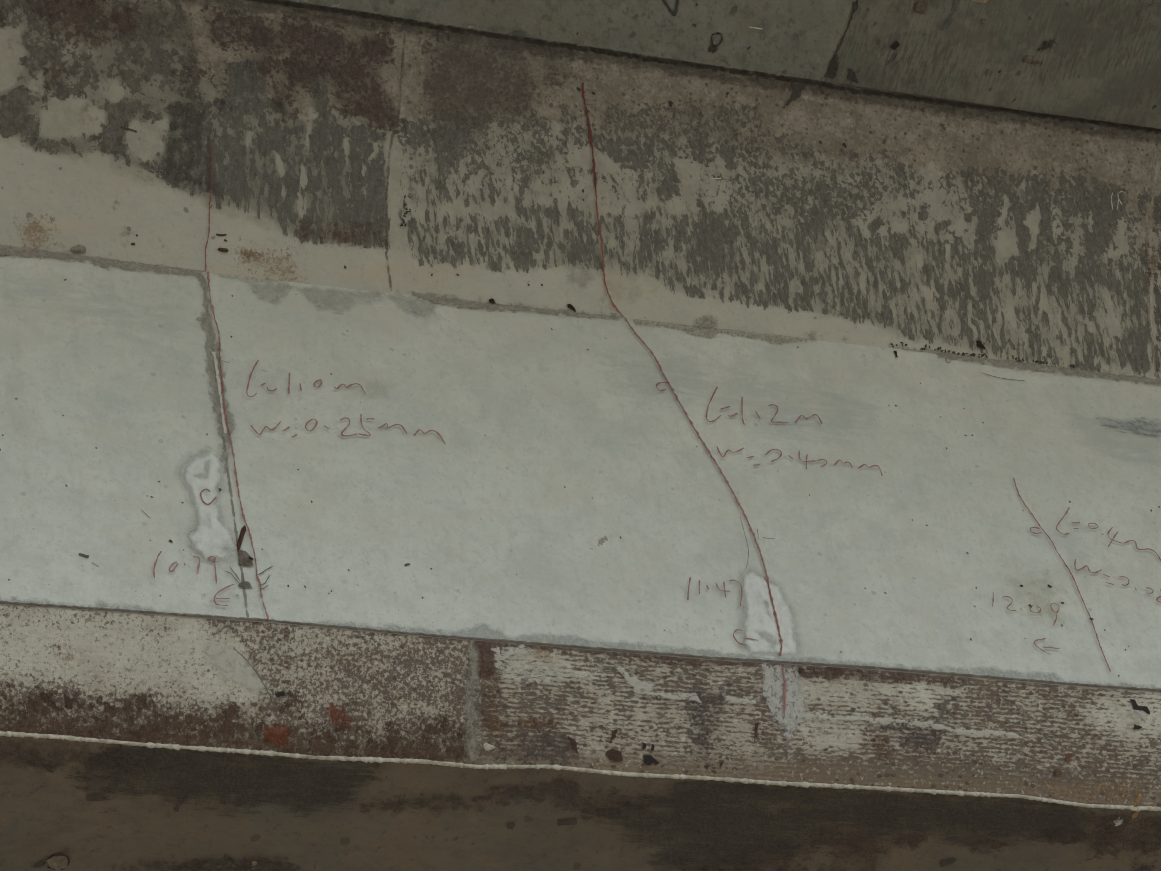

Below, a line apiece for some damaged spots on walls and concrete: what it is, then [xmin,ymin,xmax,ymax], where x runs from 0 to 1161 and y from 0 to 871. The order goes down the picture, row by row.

water stain [0,244,234,559]
crack [205,146,269,620]
water stain [0,0,1161,386]
water stain [185,573,1161,762]
crack [581,83,787,713]
crack [1013,478,1111,672]